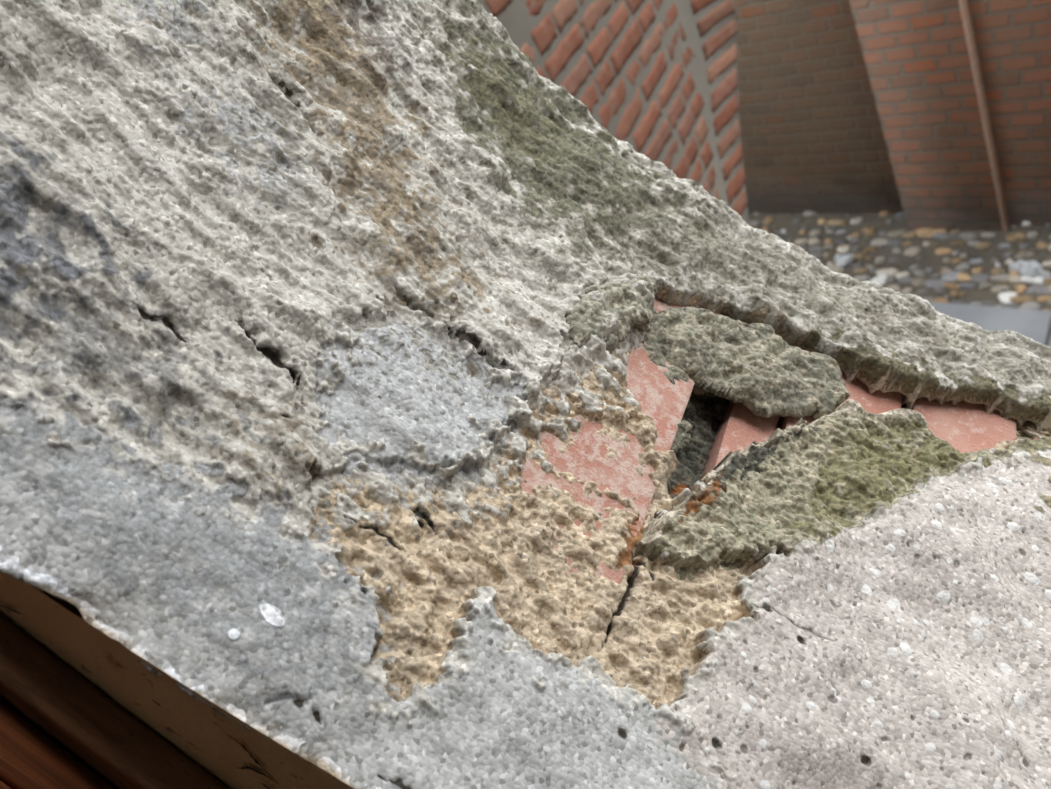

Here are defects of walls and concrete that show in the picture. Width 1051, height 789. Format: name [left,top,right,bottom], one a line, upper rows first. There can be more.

crack [138,308,186,343]
spalling [308,286,1051,710]
crack [605,512,660,643]